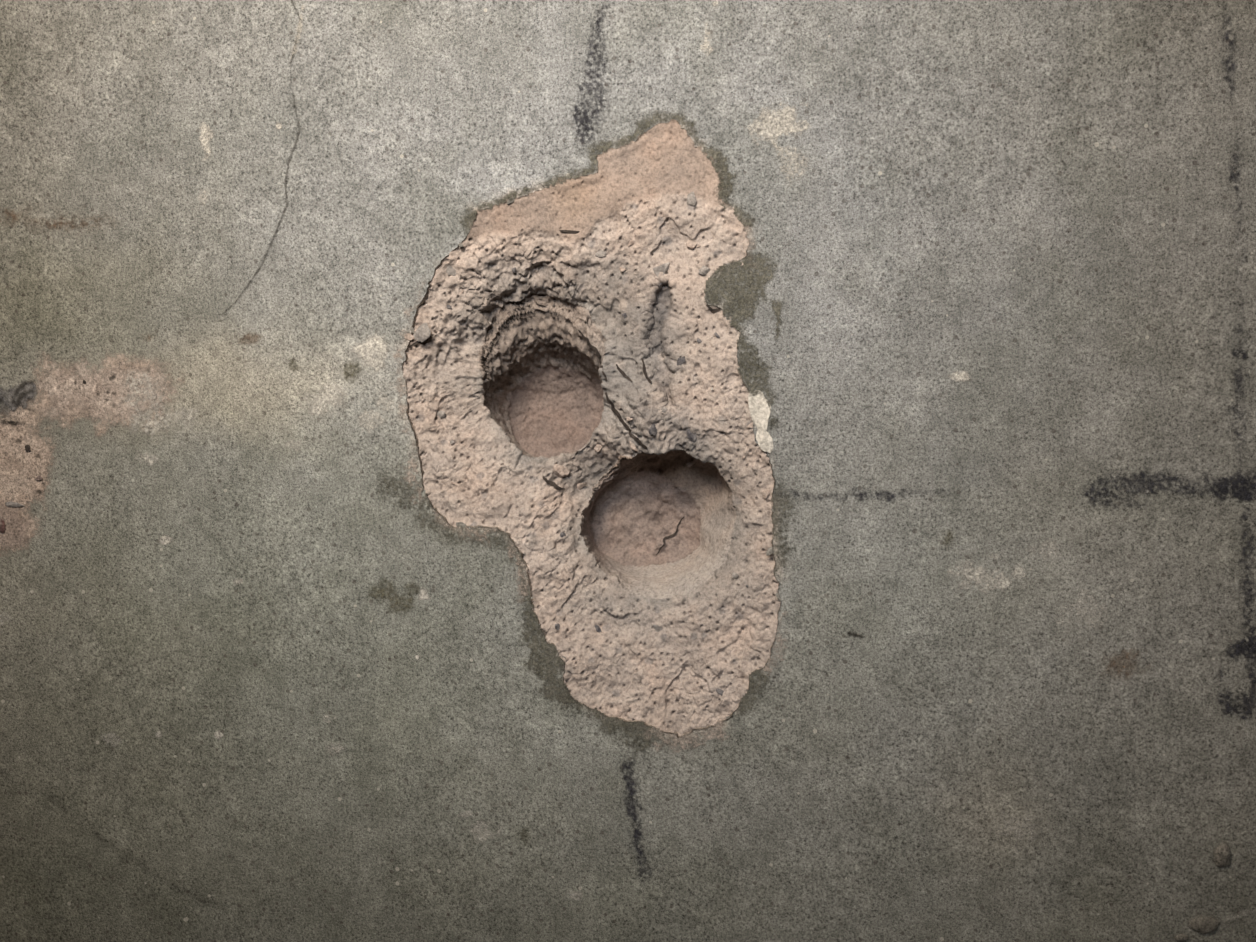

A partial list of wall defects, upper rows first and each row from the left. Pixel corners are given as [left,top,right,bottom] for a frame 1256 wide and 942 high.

peeling [0,355,197,550]
spalling [394,119,783,752]